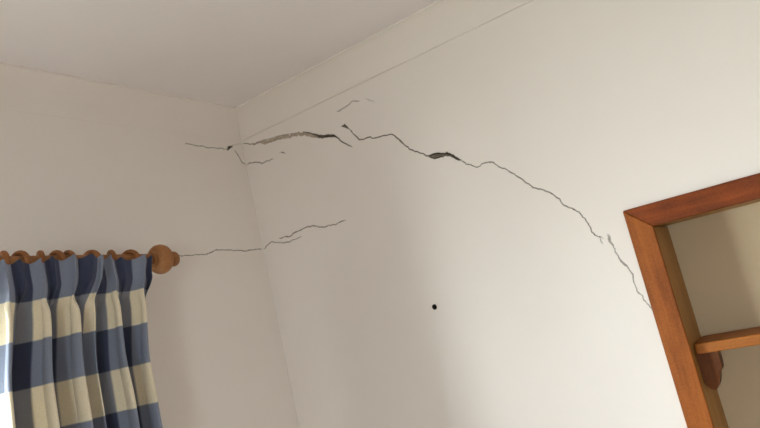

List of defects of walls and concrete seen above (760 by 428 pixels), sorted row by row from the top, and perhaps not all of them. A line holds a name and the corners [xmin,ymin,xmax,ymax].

crack [179,124,651,308]